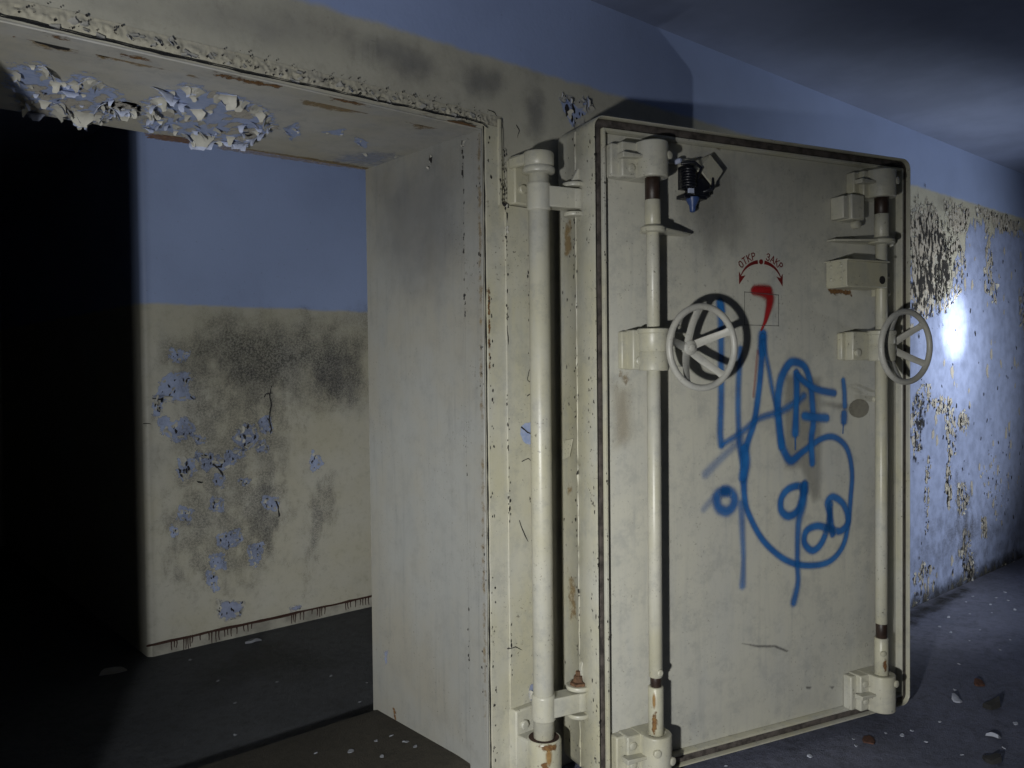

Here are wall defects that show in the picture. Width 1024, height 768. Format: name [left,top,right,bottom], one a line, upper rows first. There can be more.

flaking render [0,0,509,276]
peeling [558,92,595,159]
peeling [151,347,273,513]
crack [0,15,521,768]
peeling [910,197,1024,608]
peeling [205,528,265,621]
corrosion [529,732,559,768]